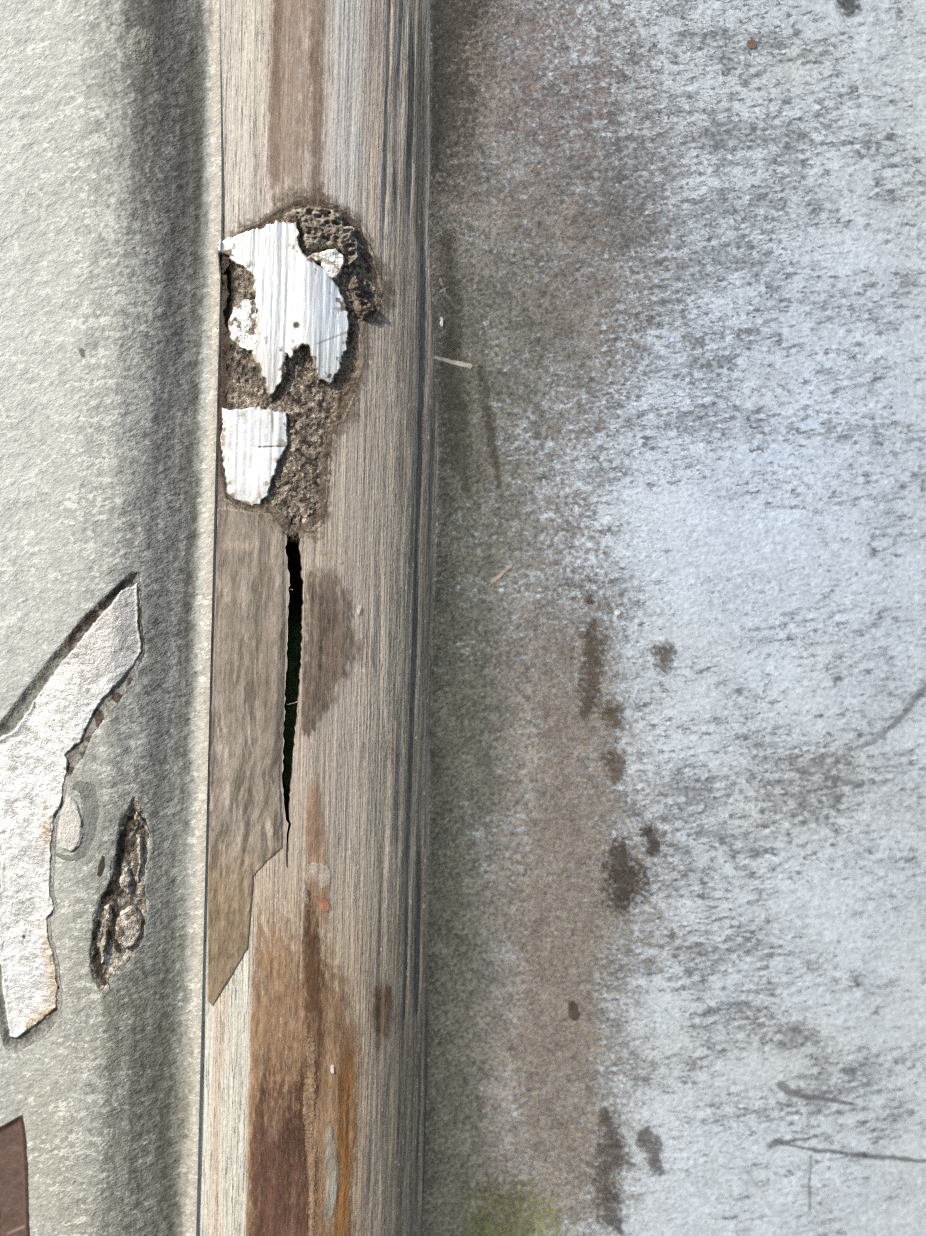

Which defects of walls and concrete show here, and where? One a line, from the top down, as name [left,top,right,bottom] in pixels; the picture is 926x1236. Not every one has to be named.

spalling [214,195,385,535]
peeling [0,572,153,1052]
crack [282,517,304,867]
water stain [301,571,360,735]
water stain [422,0,670,1236]
water stain [651,638,676,672]
corrosion [246,787,362,1236]
corrosion [371,983,391,1037]